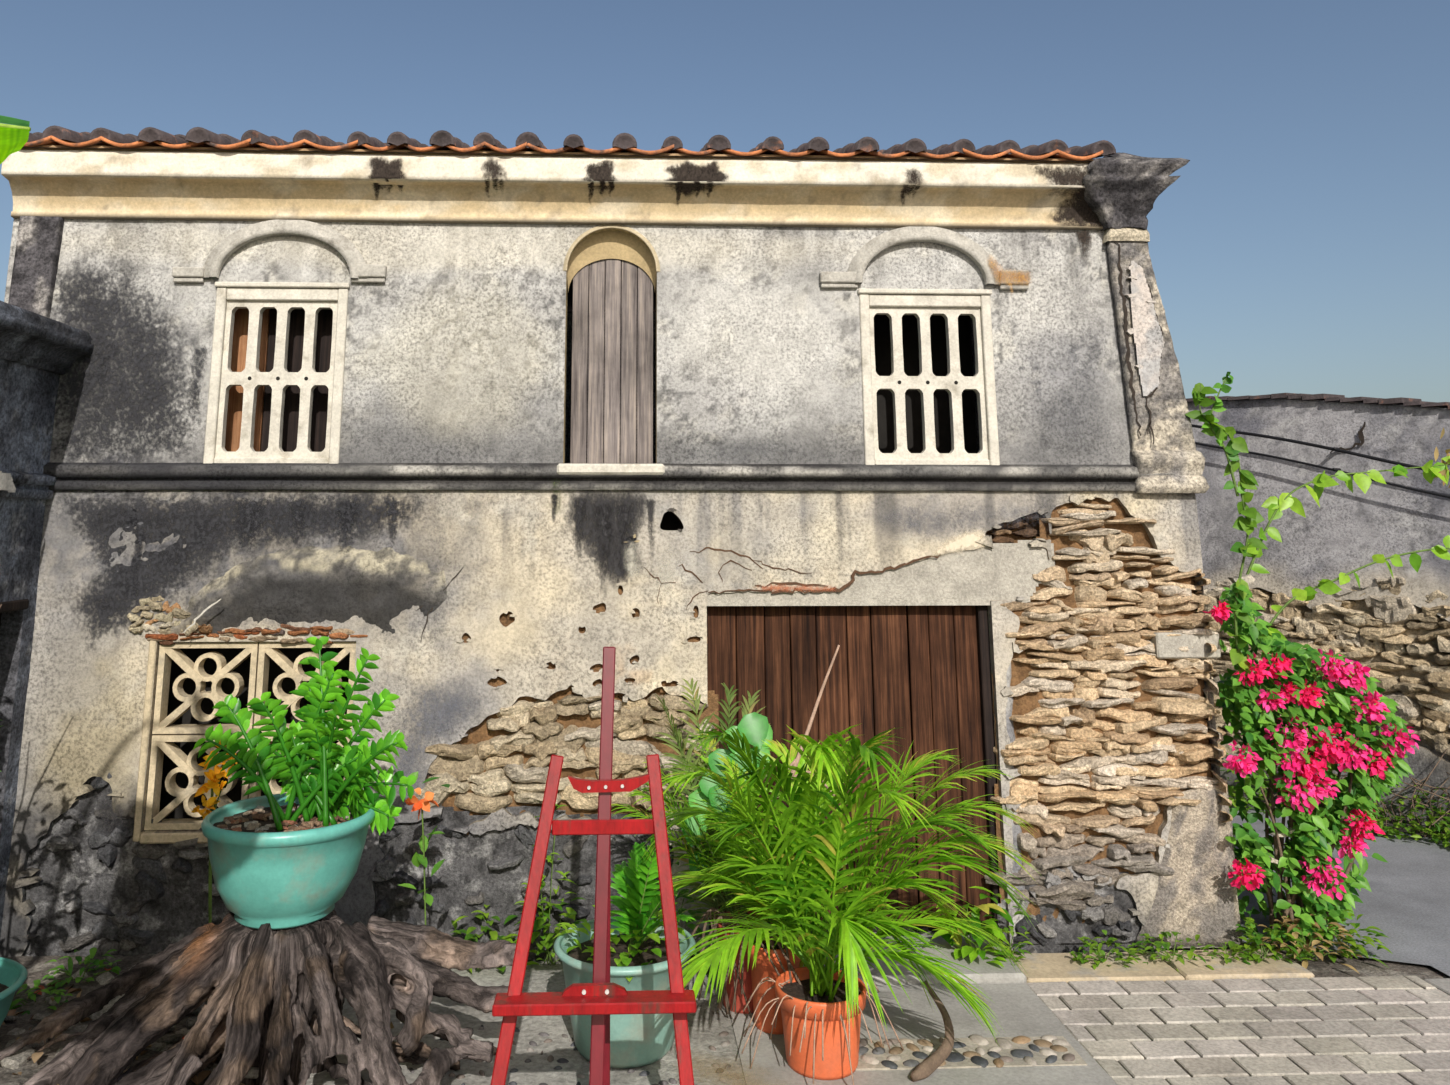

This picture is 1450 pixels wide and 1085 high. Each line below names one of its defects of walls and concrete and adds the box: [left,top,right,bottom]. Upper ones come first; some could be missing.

leakage [369,157,405,198]
leakage [584,160,615,197]
leakage [666,161,728,204]
leakage [54,262,206,462]
flaking render [1124,261,1165,398]
leakage [65,491,420,645]
leakage [552,490,654,583]
flaking render [682,606,708,644]
crack [646,547,965,610]
flaking render [975,494,1450,954]
spalling [11,773,231,958]
flaking render [369,664,719,962]